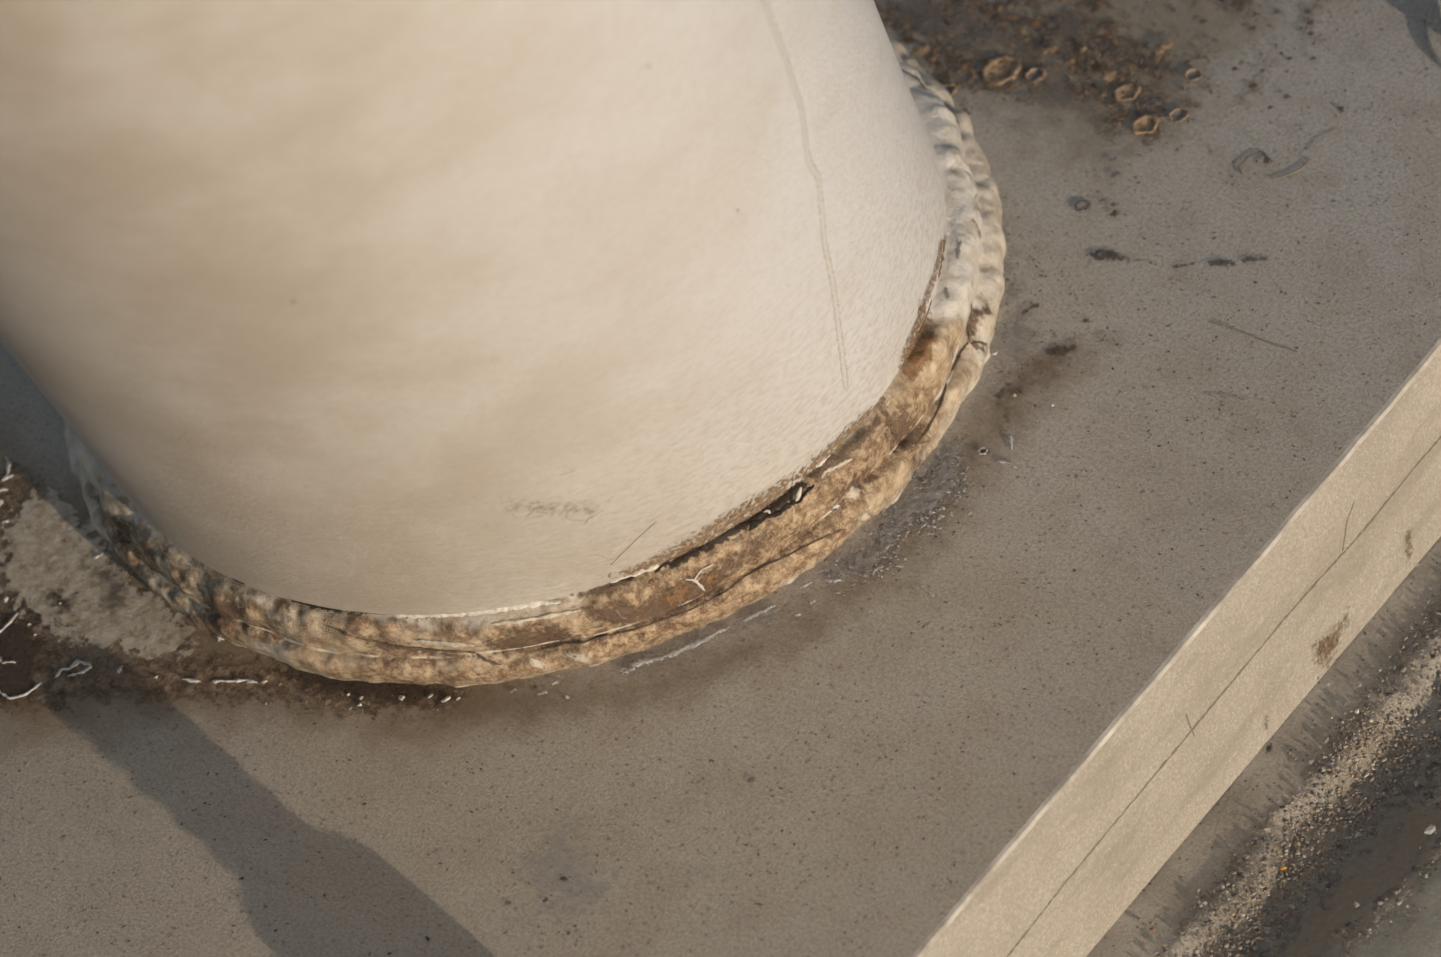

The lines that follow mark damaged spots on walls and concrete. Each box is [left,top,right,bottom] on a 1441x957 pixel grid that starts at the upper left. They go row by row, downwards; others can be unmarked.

rust [875,0,1338,276]
rust [1171,232,1302,314]
crack [289,529,844,665]
rust [0,236,1139,728]
crack [571,414,881,598]